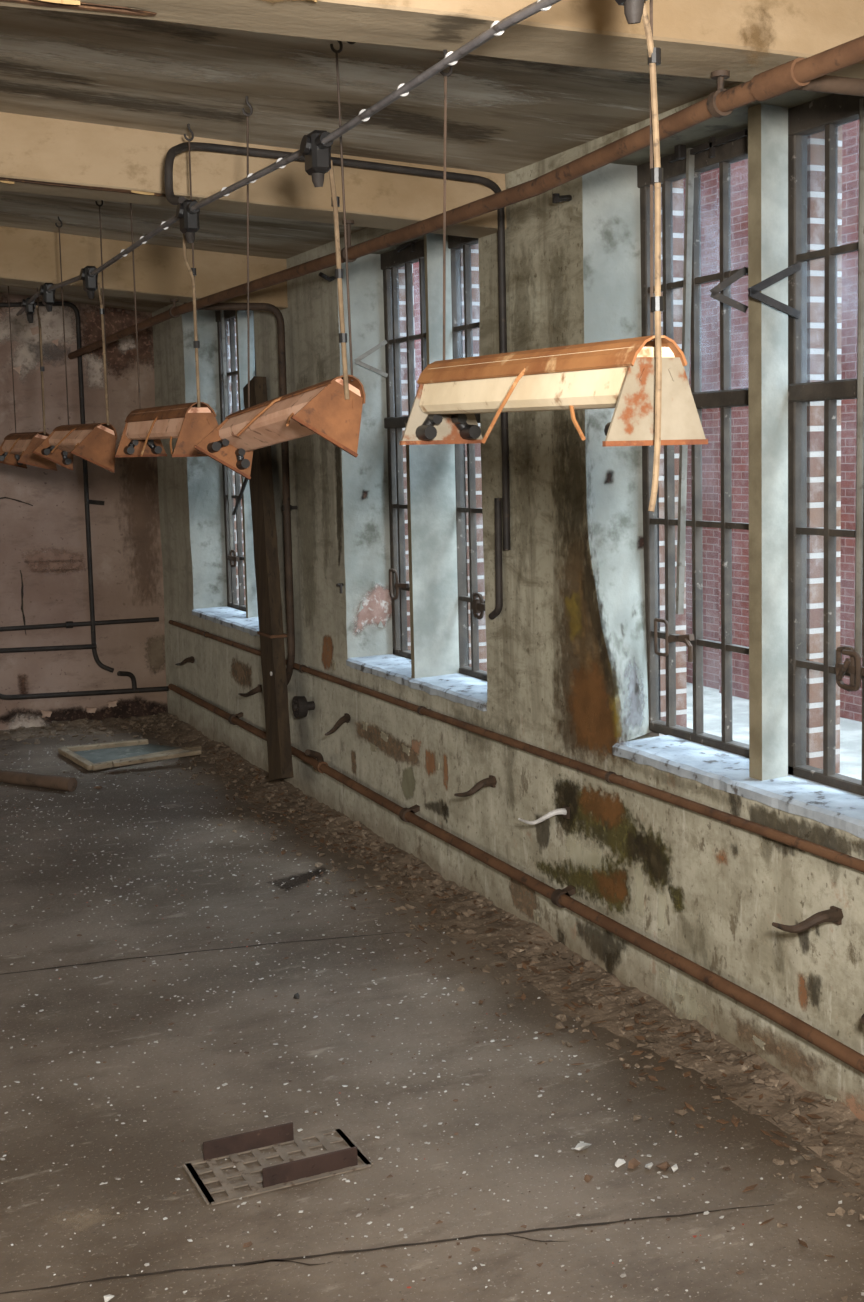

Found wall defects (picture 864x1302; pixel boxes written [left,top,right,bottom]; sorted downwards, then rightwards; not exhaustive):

spalling [0,0,157,16]
leakage [0,35,251,82]
leakage [292,53,526,105]
spalling [0,298,154,387]
spalling [355,581,392,632]
rust [554,529,627,762]
leakage [536,782,684,914]
leakage [558,923,626,973]
spalling [735,1019,823,1081]